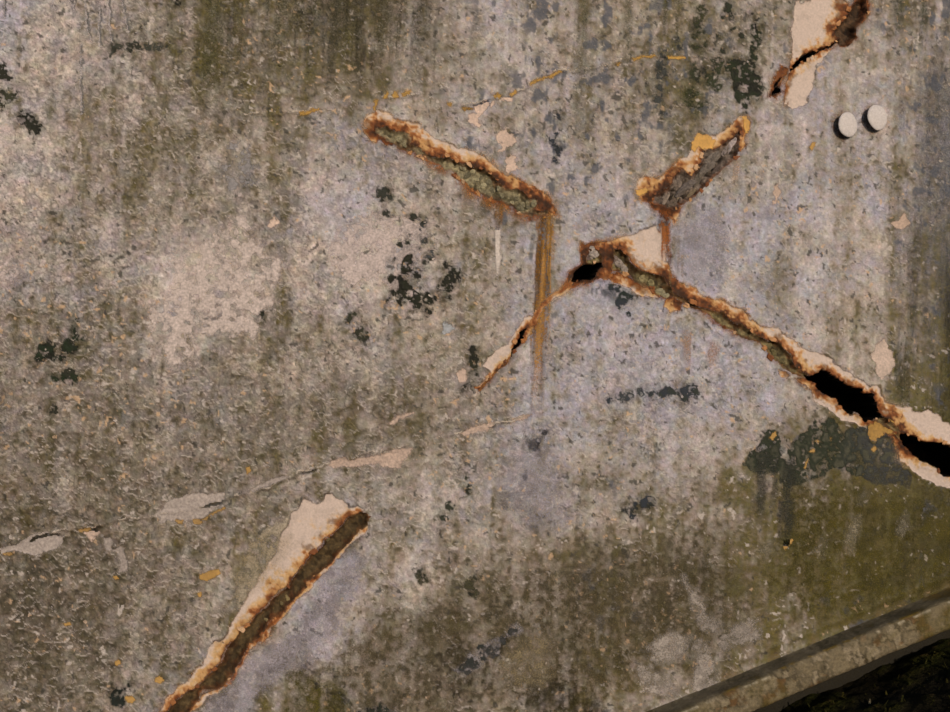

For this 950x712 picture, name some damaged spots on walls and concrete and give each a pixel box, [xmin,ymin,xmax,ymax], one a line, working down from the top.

water stain [0,62,18,112]
water stain [17,110,43,135]
water stain [34,318,85,385]
peeling [0,0,518,712]
corrosion [530,217,554,381]
crack [474,116,950,488]
water stain [743,417,912,533]